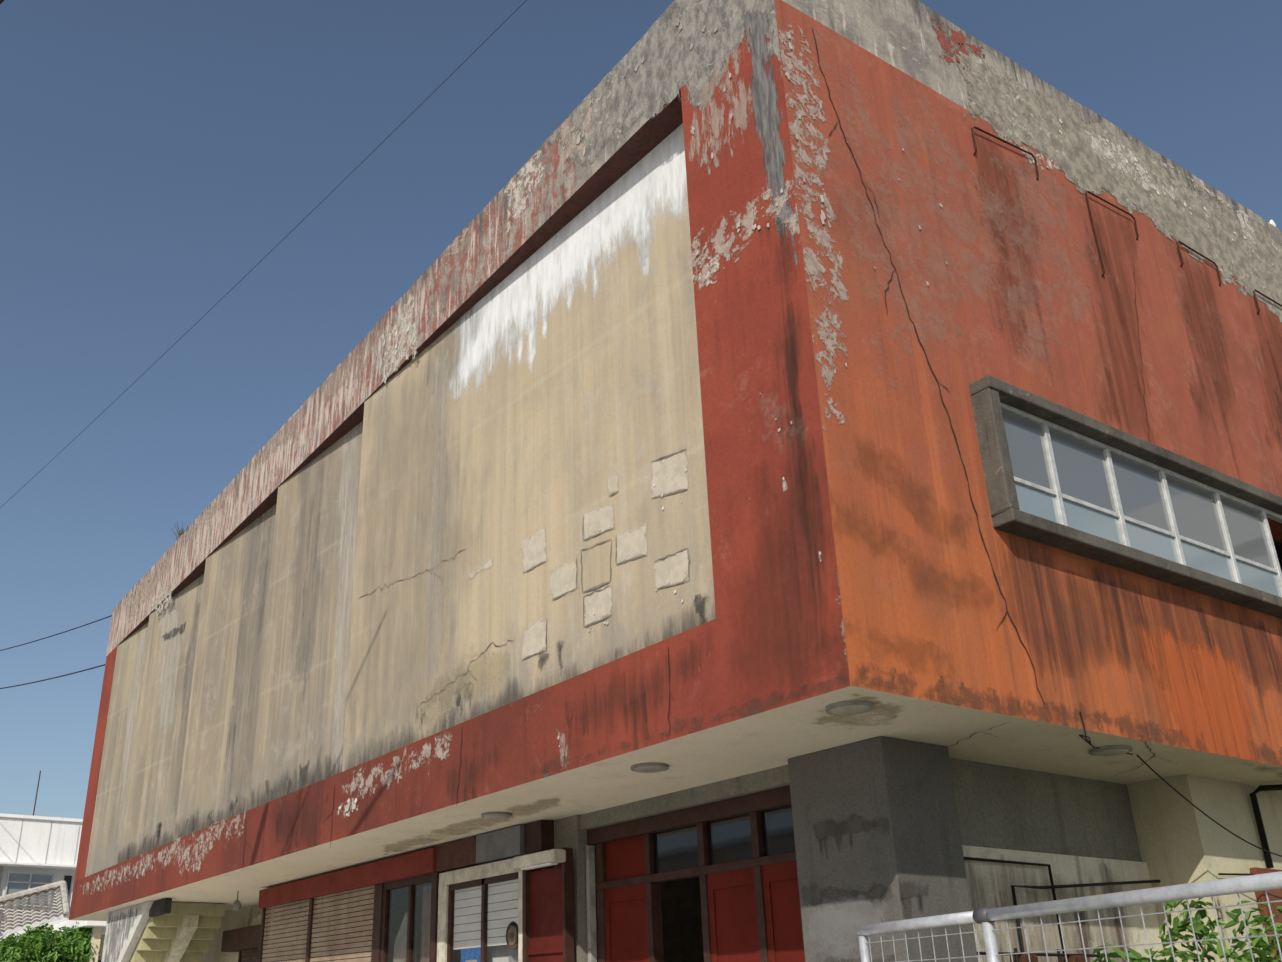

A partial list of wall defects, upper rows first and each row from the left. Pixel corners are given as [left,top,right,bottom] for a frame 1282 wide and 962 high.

flaking render [500,0,849,430]
flaking render [938,25,1282,322]
peeling [321,295,418,408]
water stain [508,312,547,369]
crack [812,28,1045,705]
water stain [163,621,186,641]
water stain [669,595,707,638]
rust [1142,626,1258,761]
peeling [83,812,246,894]
water stain [118,761,339,864]
peeling [338,732,453,816]
water stain [802,882,928,922]